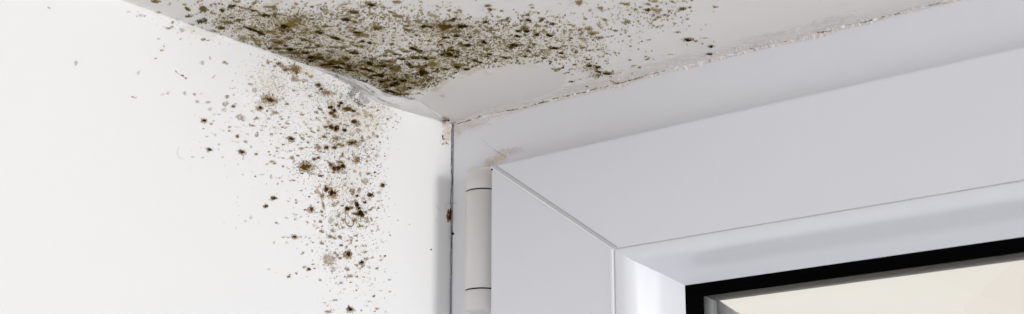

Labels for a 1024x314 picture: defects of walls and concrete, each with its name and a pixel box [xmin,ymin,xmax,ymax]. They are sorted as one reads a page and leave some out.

peeling [755,0,961,51]
peeling [505,70,658,113]
water stain [127,0,879,314]